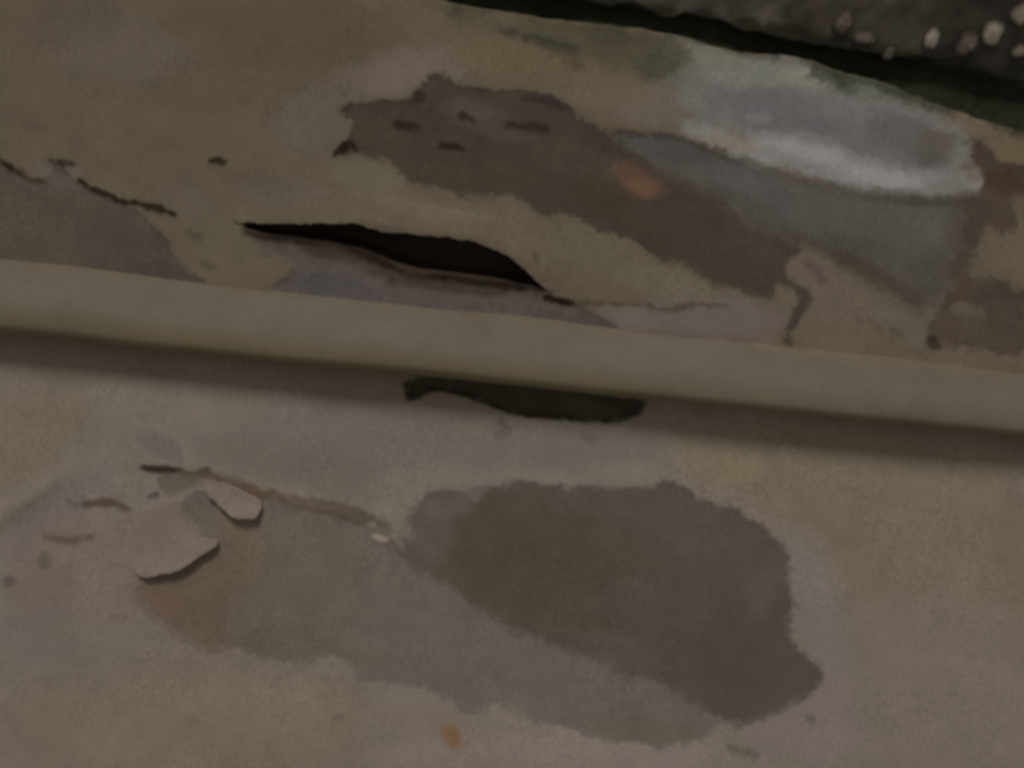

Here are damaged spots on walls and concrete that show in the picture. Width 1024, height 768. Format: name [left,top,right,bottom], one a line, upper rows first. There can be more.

peeling [0,165,219,285]
spalling [232,68,802,331]
damp [421,0,1024,322]
spalling [922,135,1024,359]
peeling [0,356,902,768]
damp [401,472,829,735]